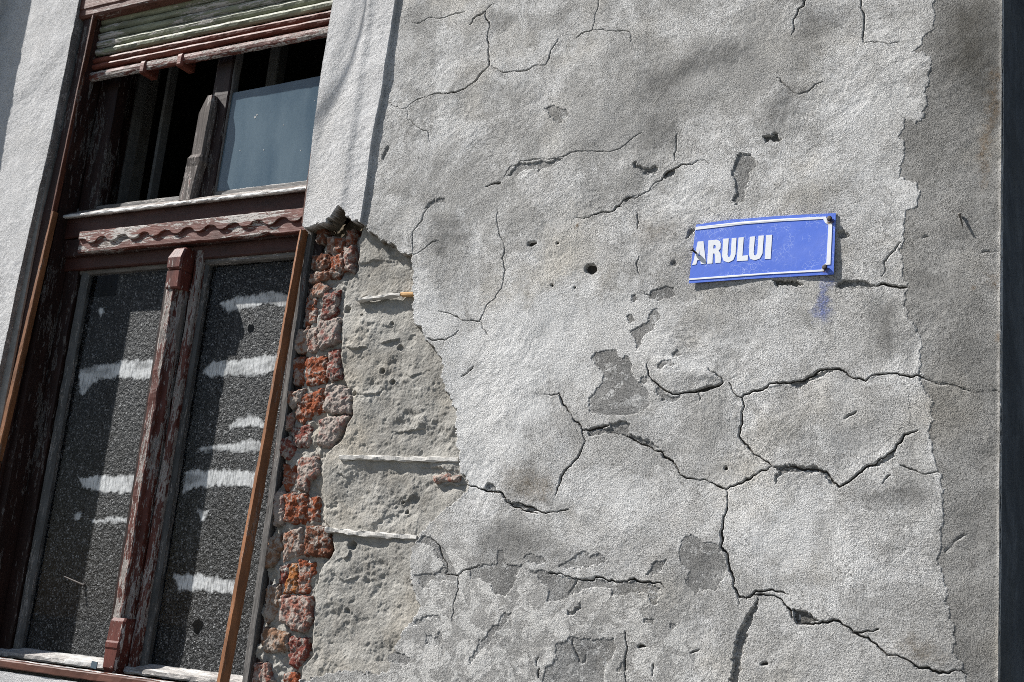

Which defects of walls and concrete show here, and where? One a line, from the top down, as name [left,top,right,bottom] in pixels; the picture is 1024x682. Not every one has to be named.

crack [389,1,629,142]
crack [861,0,902,44]
crack [581,135,710,230]
peeling [732,154,756,205]
crack [428,210,506,341]
peeling [589,286,682,451]
crack [874,236,930,289]
peeling [898,0,1002,682]
spalling [252,220,469,682]
crack [431,538,480,620]
crack [466,362,997,675]